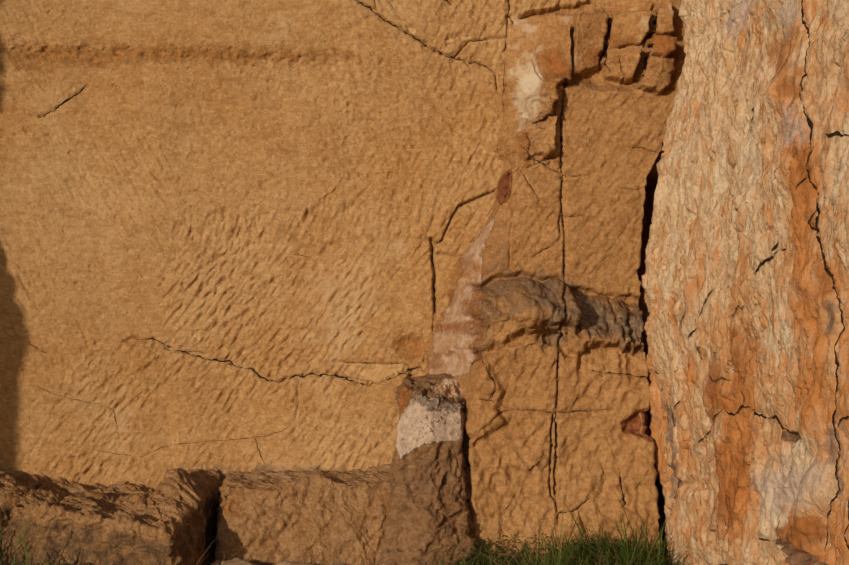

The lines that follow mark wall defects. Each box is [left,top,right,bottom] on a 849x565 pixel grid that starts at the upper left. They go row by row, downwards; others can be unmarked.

crack [430,193,487,312]
crack [471,84,626,513]
crack [754,235,786,275]
crack [796,0,849,549]
crack [140,338,423,407]
spalling [431,378,466,401]
crack [680,290,798,446]